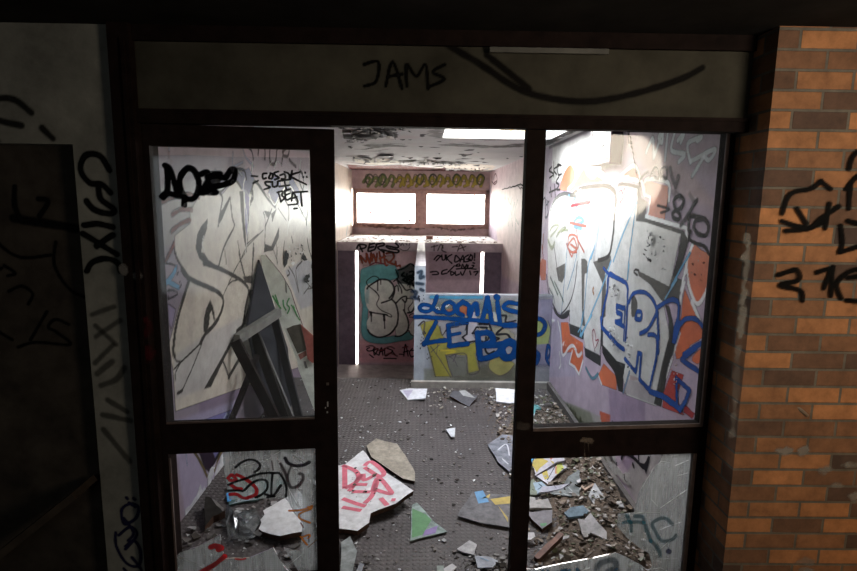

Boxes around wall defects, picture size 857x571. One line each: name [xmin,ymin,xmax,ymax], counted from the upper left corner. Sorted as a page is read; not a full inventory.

peeling [339,127,495,172]